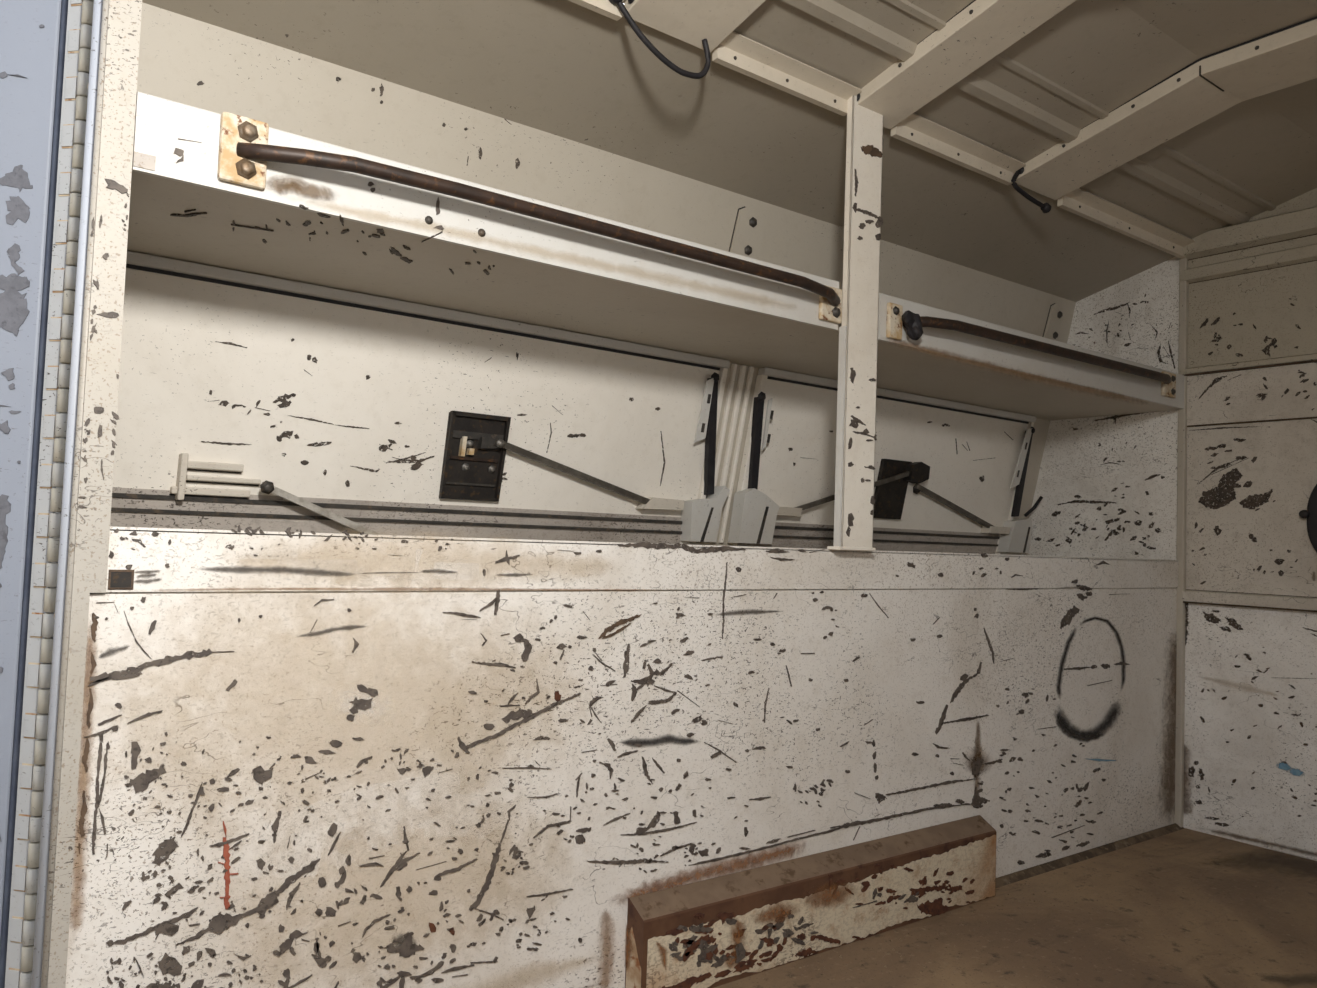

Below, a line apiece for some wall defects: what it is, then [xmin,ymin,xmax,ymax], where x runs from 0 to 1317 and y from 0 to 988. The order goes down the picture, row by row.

rust [272,179,331,199]
peeling [0,243,30,336]
peeling [1189,426,1276,511]
peeling [82,597,146,772]
peeling [543,758,721,873]
peeling [102,732,573,988]
rust [627,846,798,899]
rust [727,922,743,967]
peeling [662,910,865,988]
rust [759,905,790,922]
rust [807,884,848,906]
peeling [828,864,975,915]